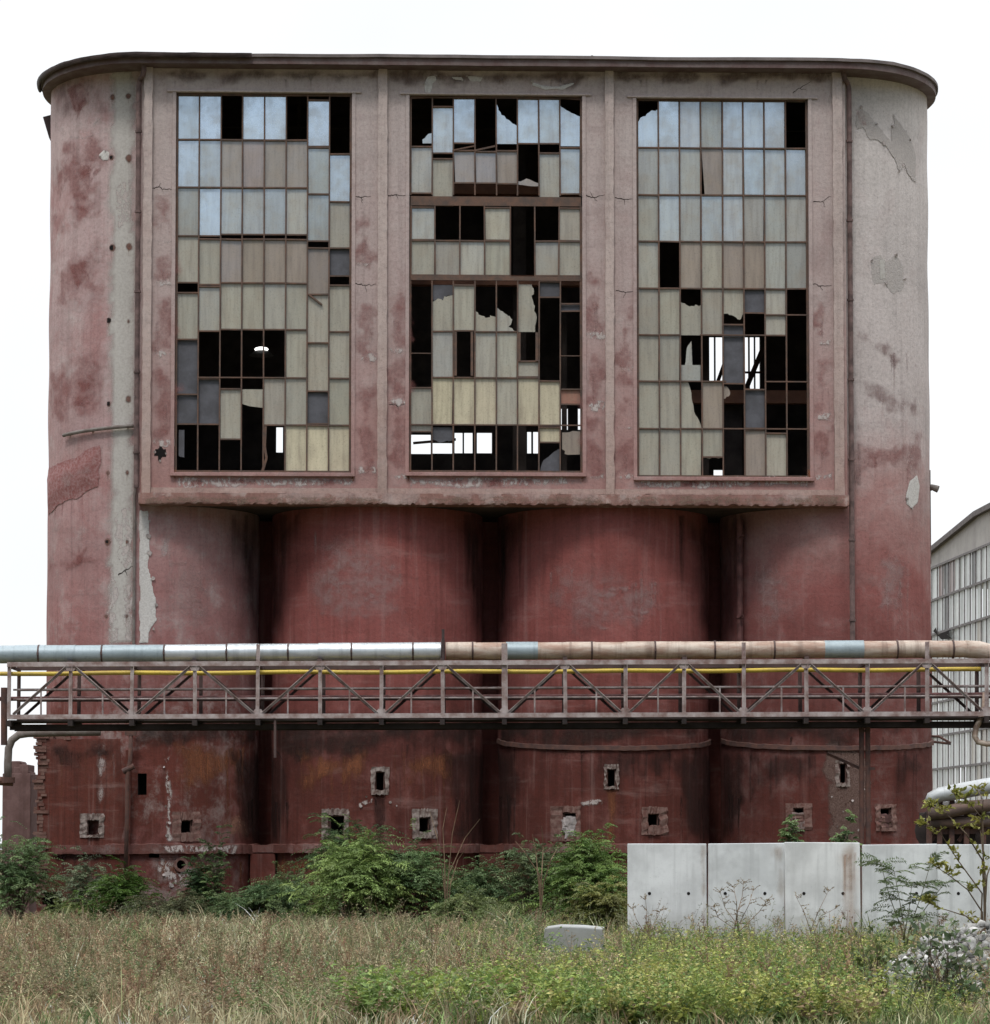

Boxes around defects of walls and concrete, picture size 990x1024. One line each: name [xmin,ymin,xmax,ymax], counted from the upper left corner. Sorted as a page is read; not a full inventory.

peeling [856,105,916,182]
peeling [871,253,907,293]
peeling [88,72,167,643]
spalling [906,475,920,510]
flaking render [823,741,872,841]